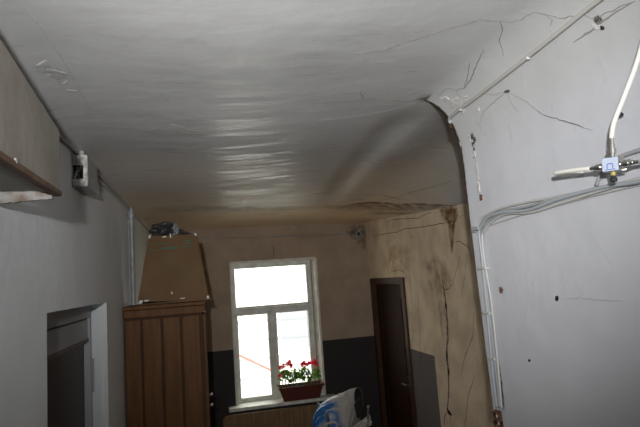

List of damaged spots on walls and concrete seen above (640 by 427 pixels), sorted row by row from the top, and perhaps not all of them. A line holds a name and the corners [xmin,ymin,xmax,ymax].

crack [355,3,629,56]
crack [325,50,484,120]
crack [480,91,592,131]
leakage [441,207,458,250]
crack [438,241,474,425]